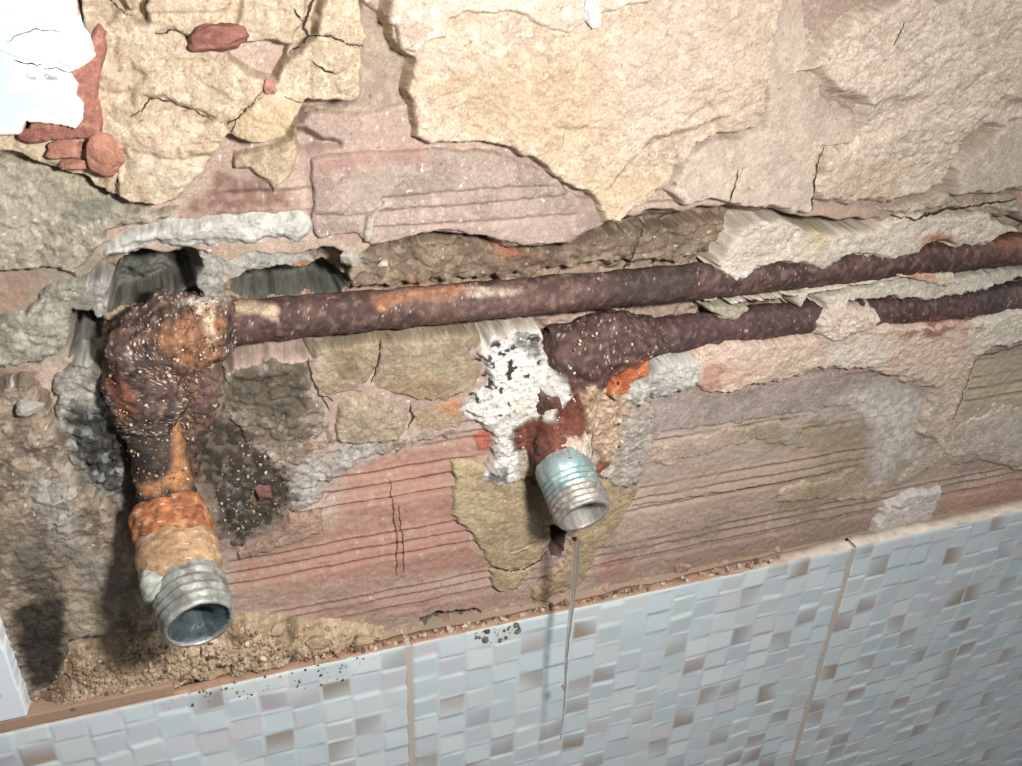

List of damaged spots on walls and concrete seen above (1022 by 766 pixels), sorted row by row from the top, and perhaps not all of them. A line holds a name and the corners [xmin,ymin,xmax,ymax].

crack [110,0,188,38]
crack [290,0,364,75]
spalling [27,23,107,140]
crack [130,93,305,137]
spalling [68,248,194,359]
spalling [230,257,350,300]
rust [181,361,223,477]
rust [512,393,591,479]
rust [606,360,650,399]
damp [193,420,384,539]
spalling [548,524,567,557]
damp [15,600,64,686]